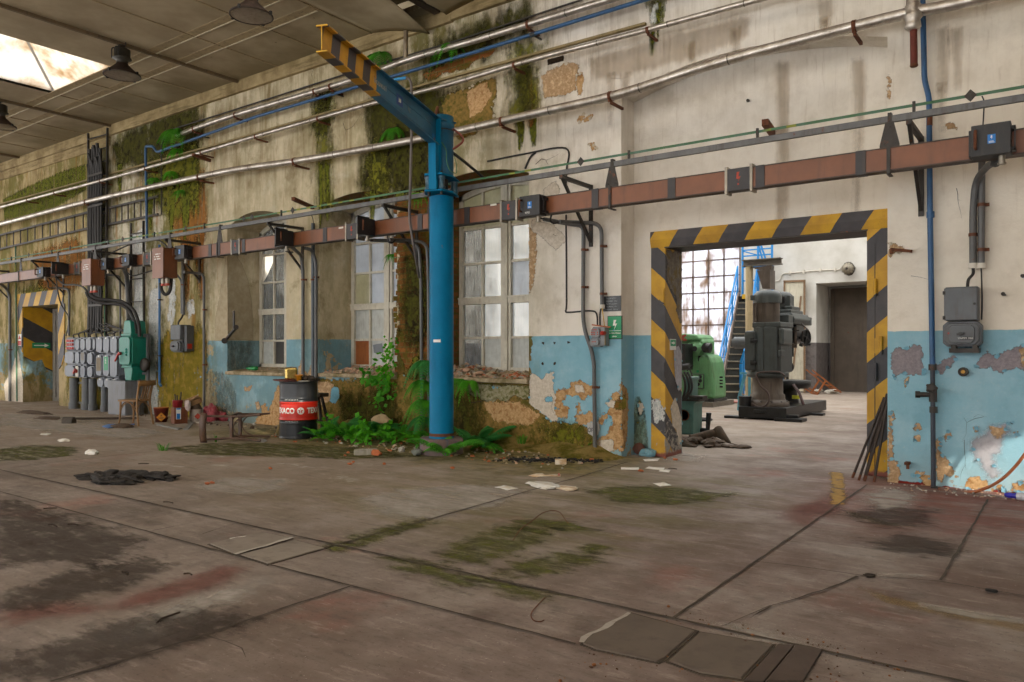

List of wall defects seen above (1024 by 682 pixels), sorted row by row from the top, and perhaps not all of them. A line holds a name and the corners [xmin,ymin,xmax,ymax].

flaking render [541,55,585,98]
flaking render [441,78,497,140]
leakage [516,118,537,151]
leakage [319,163,330,228]
peeling [891,344,958,387]
peeling [974,343,1024,374]
flaking render [244,385,279,425]
flaking render [454,346,683,452]
spalling [886,410,954,486]
peeling [965,421,1024,493]